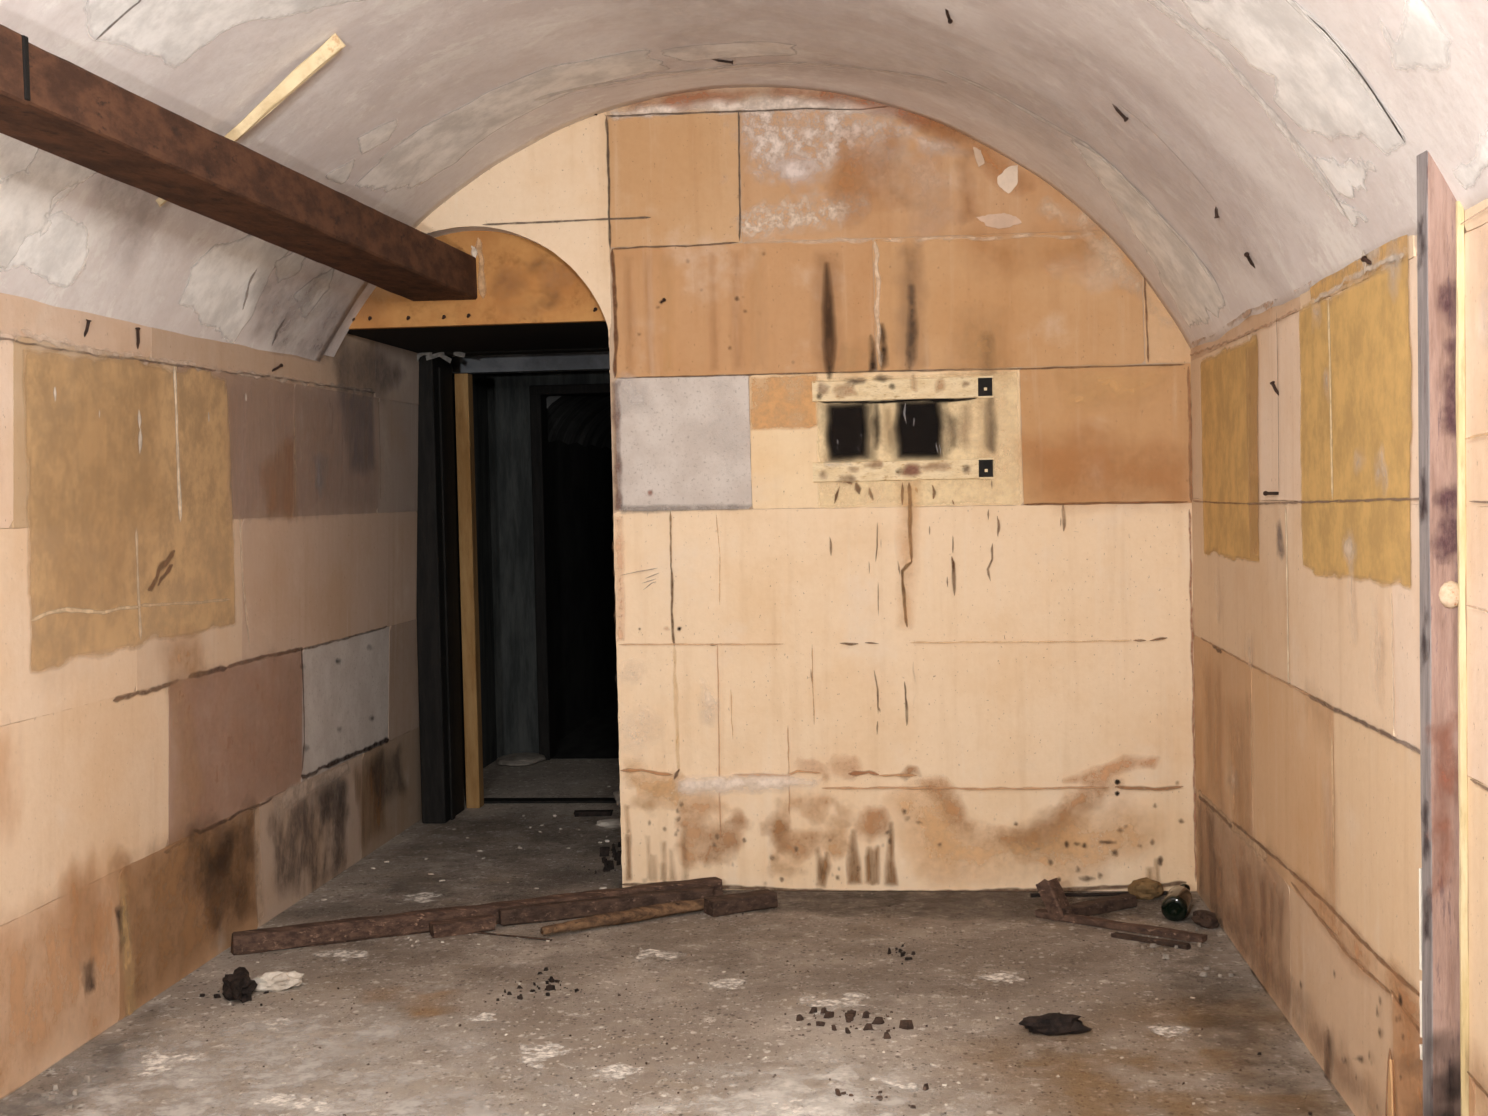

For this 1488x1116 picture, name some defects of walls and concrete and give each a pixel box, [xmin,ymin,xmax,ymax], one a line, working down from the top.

leakage [614,96,900,235]
peeling [1183,0,1404,226]
crack [471,106,1419,892]
leakage [10,764,348,1042]
leakage [641,777,799,862]
leakage [772,819,841,856]
leakage [864,811,886,834]
leakage [904,760,1155,900]